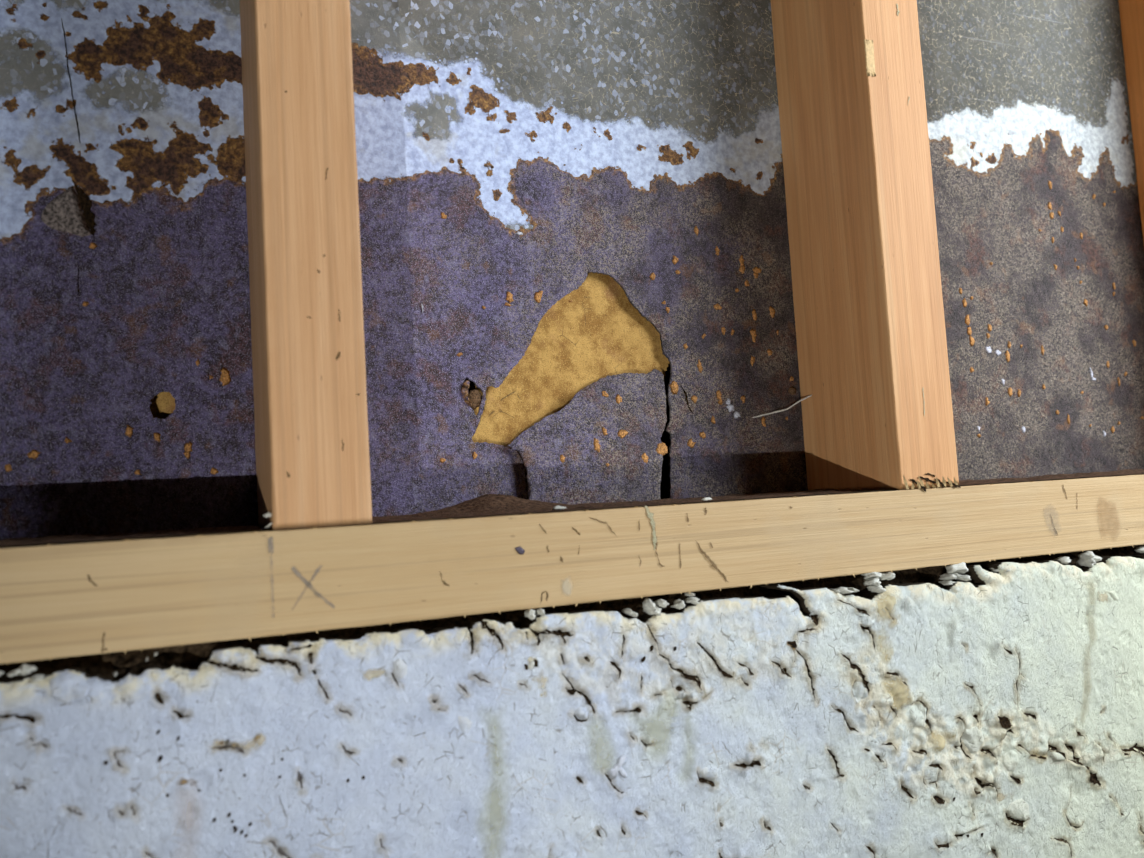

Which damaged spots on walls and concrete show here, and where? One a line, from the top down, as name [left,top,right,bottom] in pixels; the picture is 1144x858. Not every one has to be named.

rust [0,0,258,540]
rust [927,78,1144,480]
crack [0,714,47,748]
crack [211,745,244,753]
crack [208,644,352,716]
crack [458,621,572,694]
crack [562,673,595,714]
crack [610,600,1144,848]
crack [267,841,290,858]
crack [1054,809,1083,857]